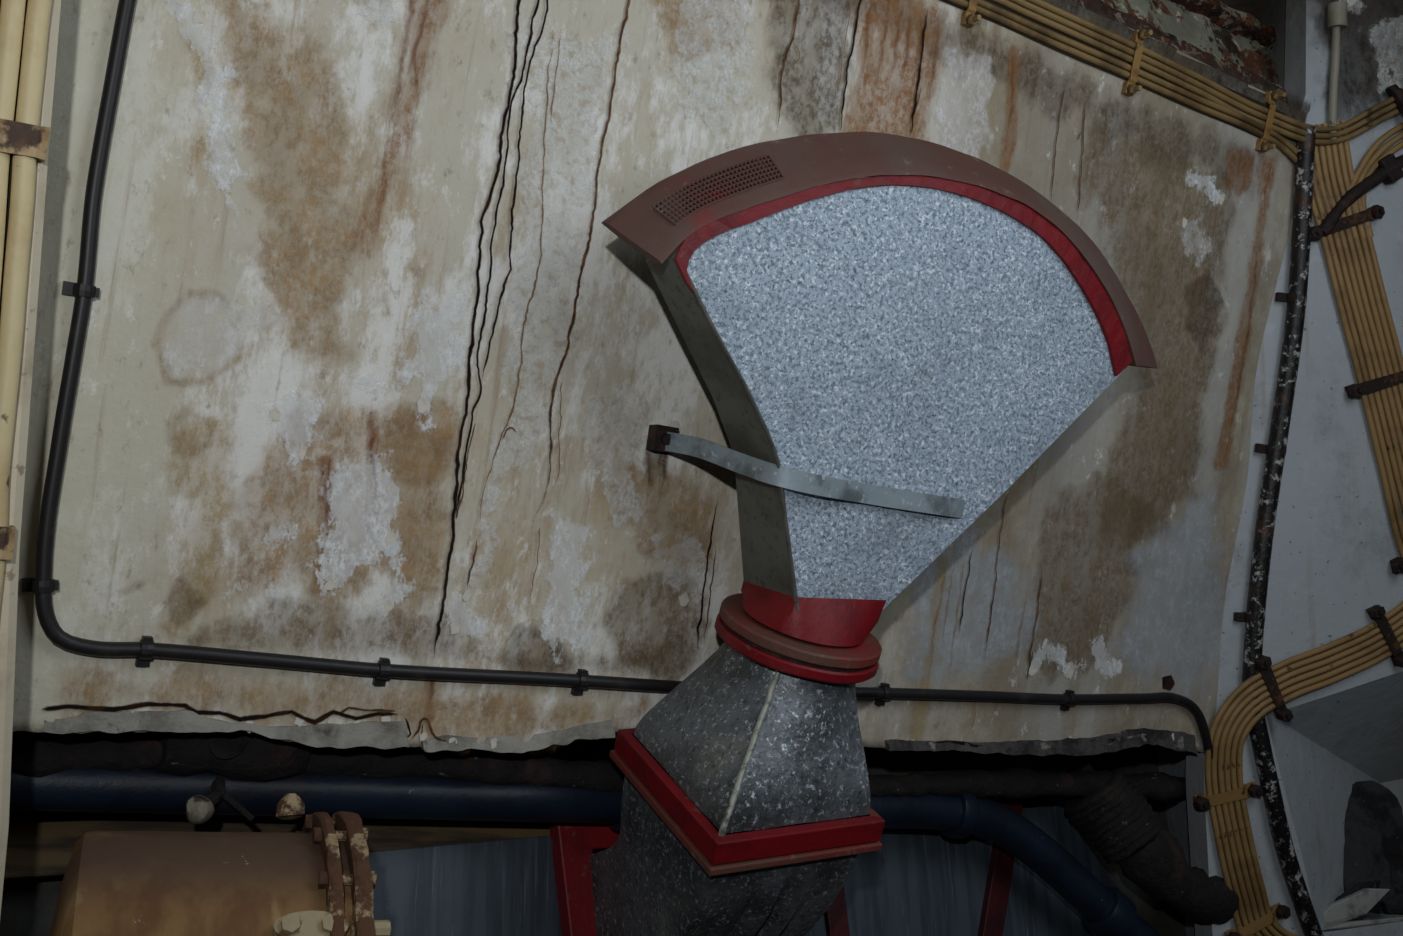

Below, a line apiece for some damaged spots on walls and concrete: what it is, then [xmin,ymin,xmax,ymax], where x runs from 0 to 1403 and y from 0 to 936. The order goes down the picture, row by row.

damp [232,18,352,352]
corrosion [361,50,425,241]
crack [837,0,862,130]
corrosion [846,0,939,138]
crack [911,15,927,132]
peeling [1370,22,1403,90]
crack [434,0,630,654]
damp [908,104,1254,693]
corrosion [1215,151,1274,467]
damp [239,403,455,598]
crack [44,702,446,741]
damp [609,575,706,680]